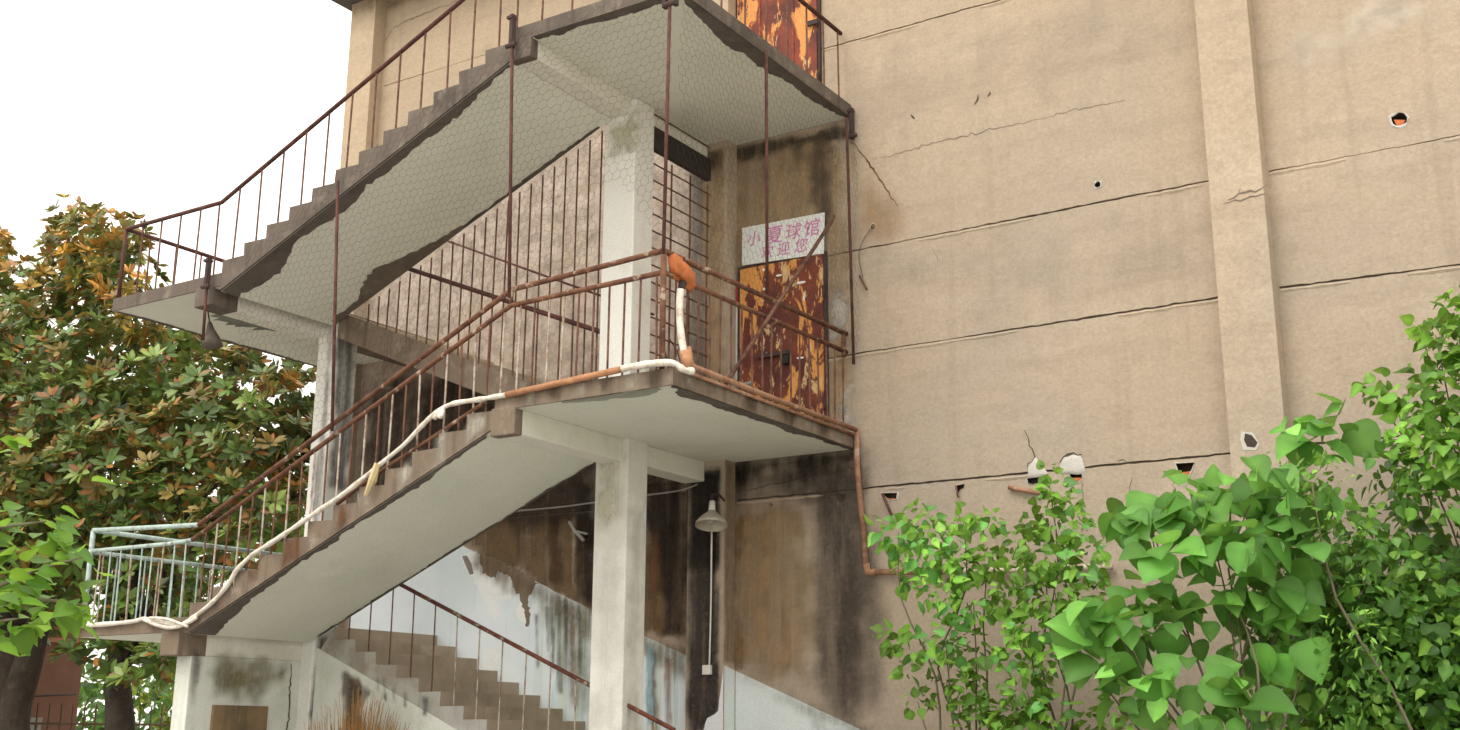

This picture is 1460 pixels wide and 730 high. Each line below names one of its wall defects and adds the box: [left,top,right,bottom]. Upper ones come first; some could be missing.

leakage [369,119,850,428]
leakage [313,338,495,521]
leakage [472,462,611,668]
leakage [644,454,877,730]